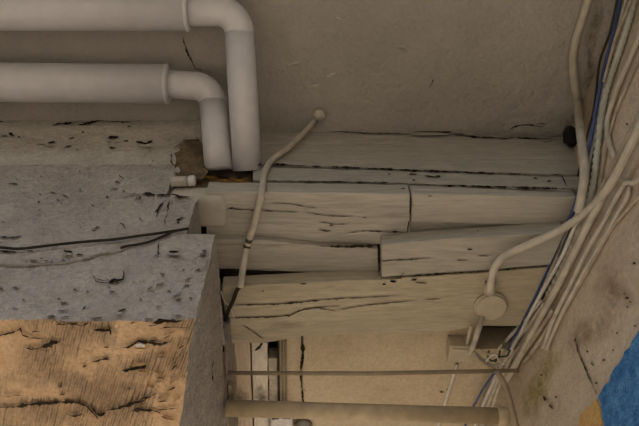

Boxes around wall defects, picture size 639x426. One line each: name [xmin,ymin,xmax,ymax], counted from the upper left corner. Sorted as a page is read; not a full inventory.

spalling [170,136,253,189]
crack [128,192,190,225]
crack [229,163,571,279]
crack [92,266,129,283]
crack [237,296,409,339]
spalling [122,339,187,402]
crack [298,336,306,402]